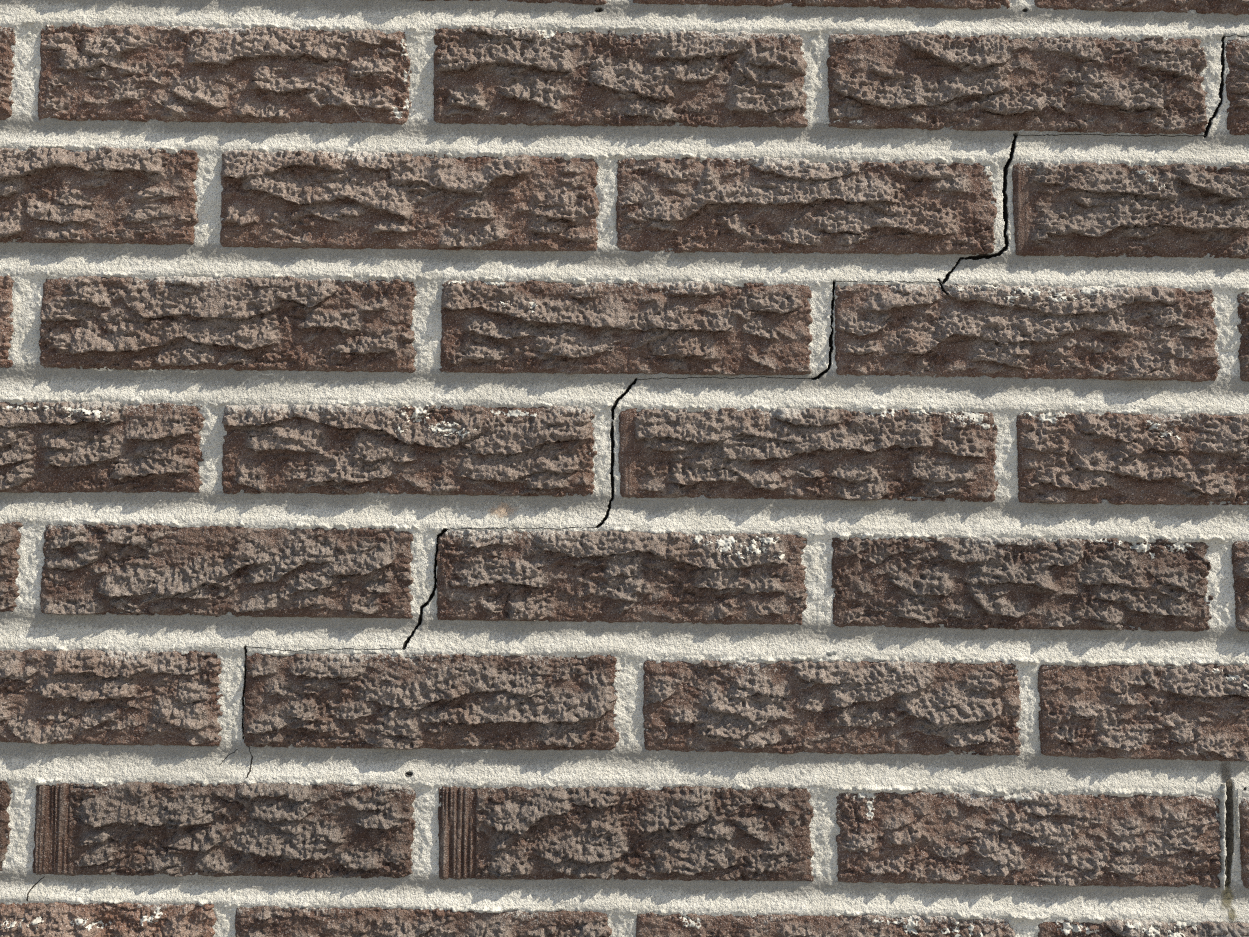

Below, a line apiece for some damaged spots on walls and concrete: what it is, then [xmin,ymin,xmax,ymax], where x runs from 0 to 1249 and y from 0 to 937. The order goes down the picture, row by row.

crack [220,34,1249,778]